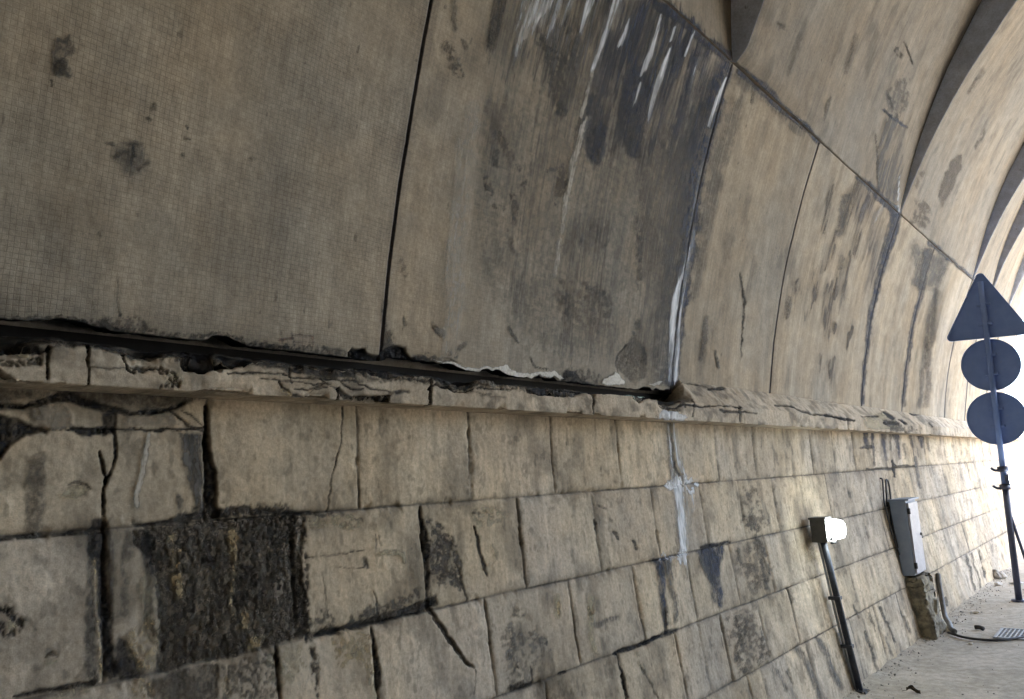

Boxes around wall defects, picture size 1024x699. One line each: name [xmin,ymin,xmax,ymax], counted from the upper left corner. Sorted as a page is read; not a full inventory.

damp [505,0,819,388]
damp [939,155,962,205]
damp [811,81,928,404]
crack [739,282,747,345]
spalling [336,320,669,414]
damp [180,433,204,513]
crack [227,372,387,512]
damp [660,410,685,421]
crack [660,382,846,564]
crack [455,526,487,601]
damp [698,541,730,608]
crack [425,607,477,672]